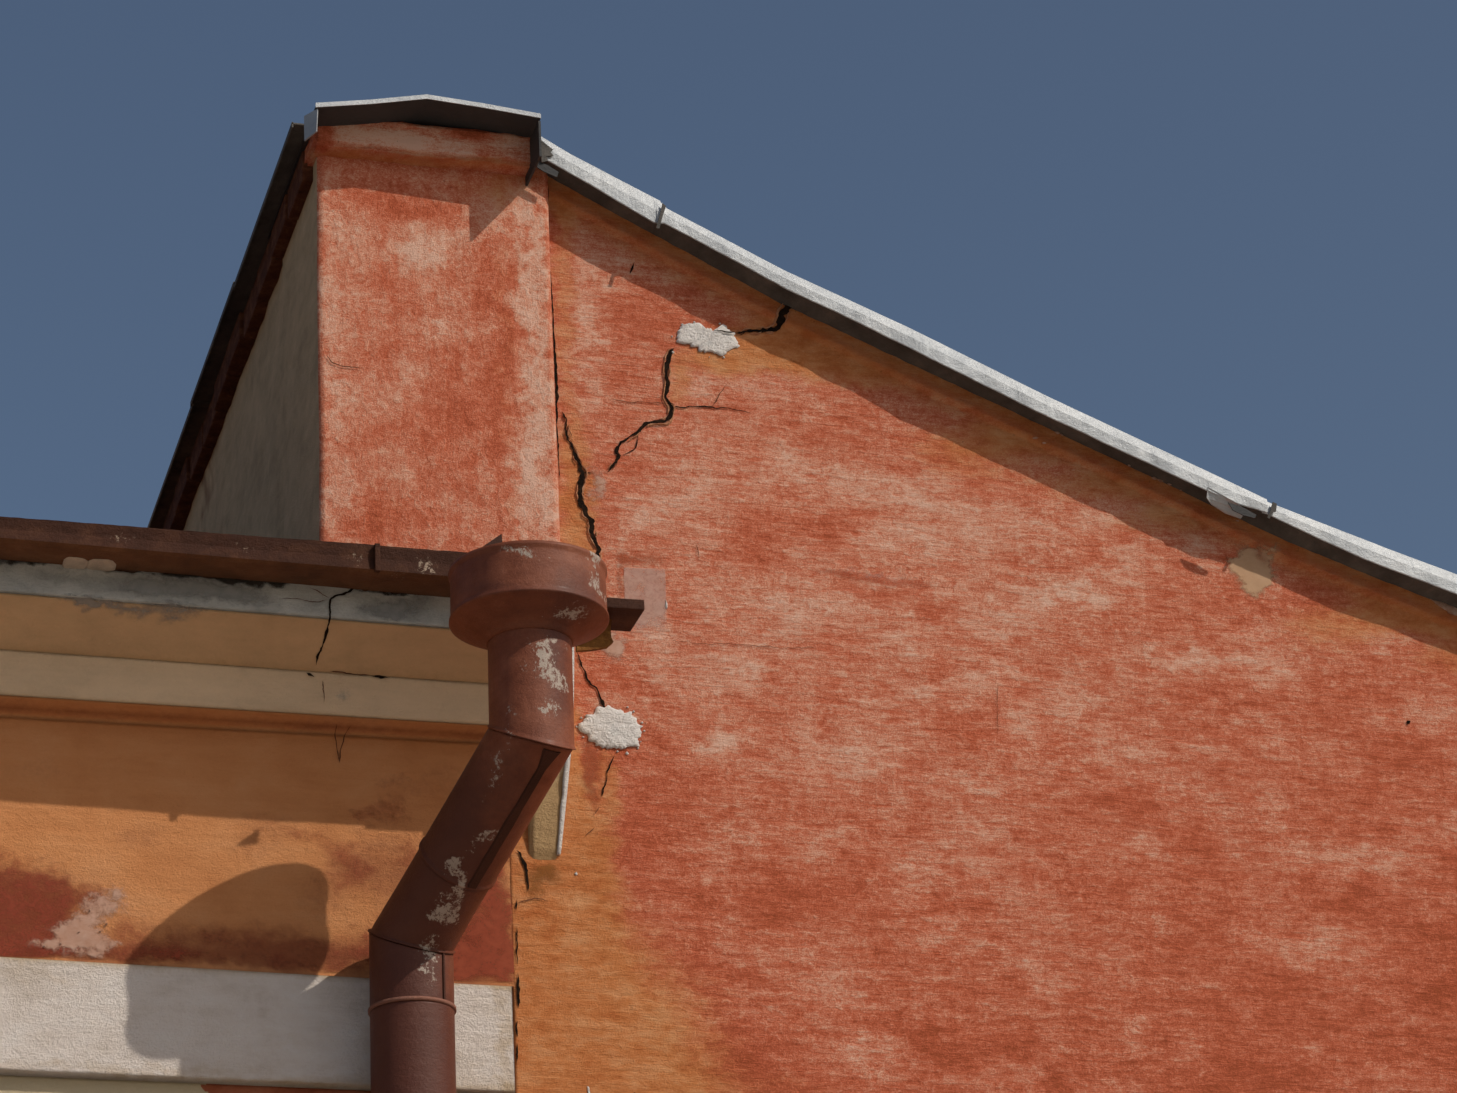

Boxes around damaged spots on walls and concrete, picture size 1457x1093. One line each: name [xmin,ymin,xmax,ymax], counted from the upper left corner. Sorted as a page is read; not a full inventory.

crack [550,271,791,559]
spalling [1228,546,1276,598]
crack [284,588,390,761]
peeling [33,889,124,957]